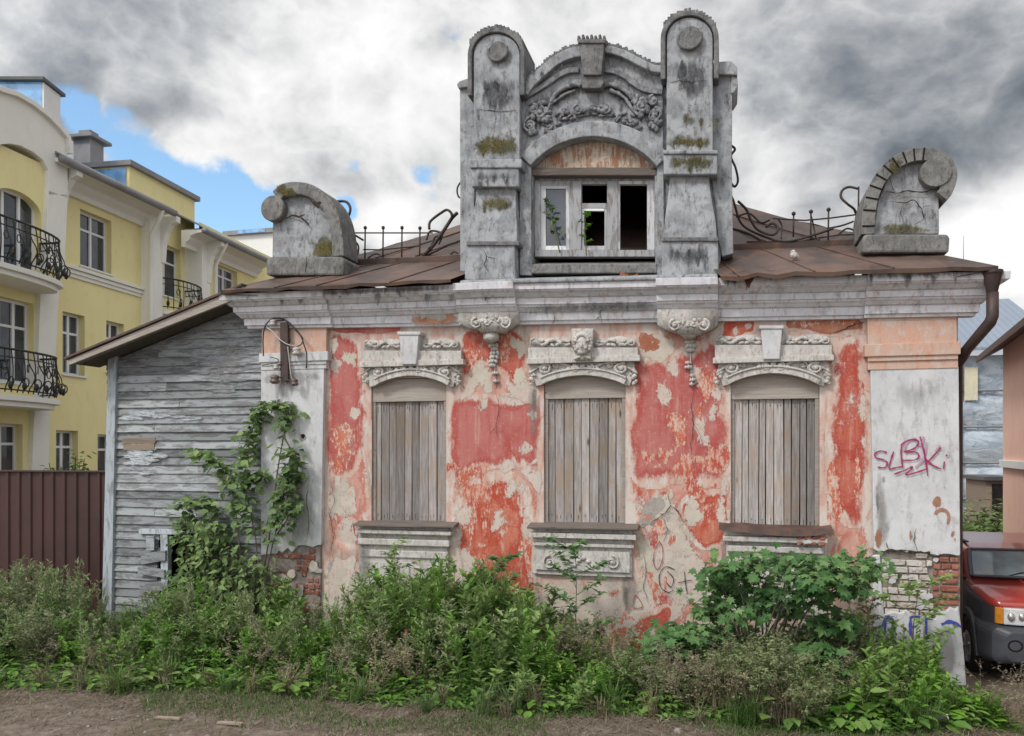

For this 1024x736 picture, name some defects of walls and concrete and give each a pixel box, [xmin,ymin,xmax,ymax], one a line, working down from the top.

water stain [484,80,512,109]
water stain [677,60,704,94]
water stain [674,139,702,177]
crack [883,179,936,225]
peeling [783,320,872,528]
peeling [269,314,757,653]
crack [641,497,686,539]
flaking render [875,529,960,616]